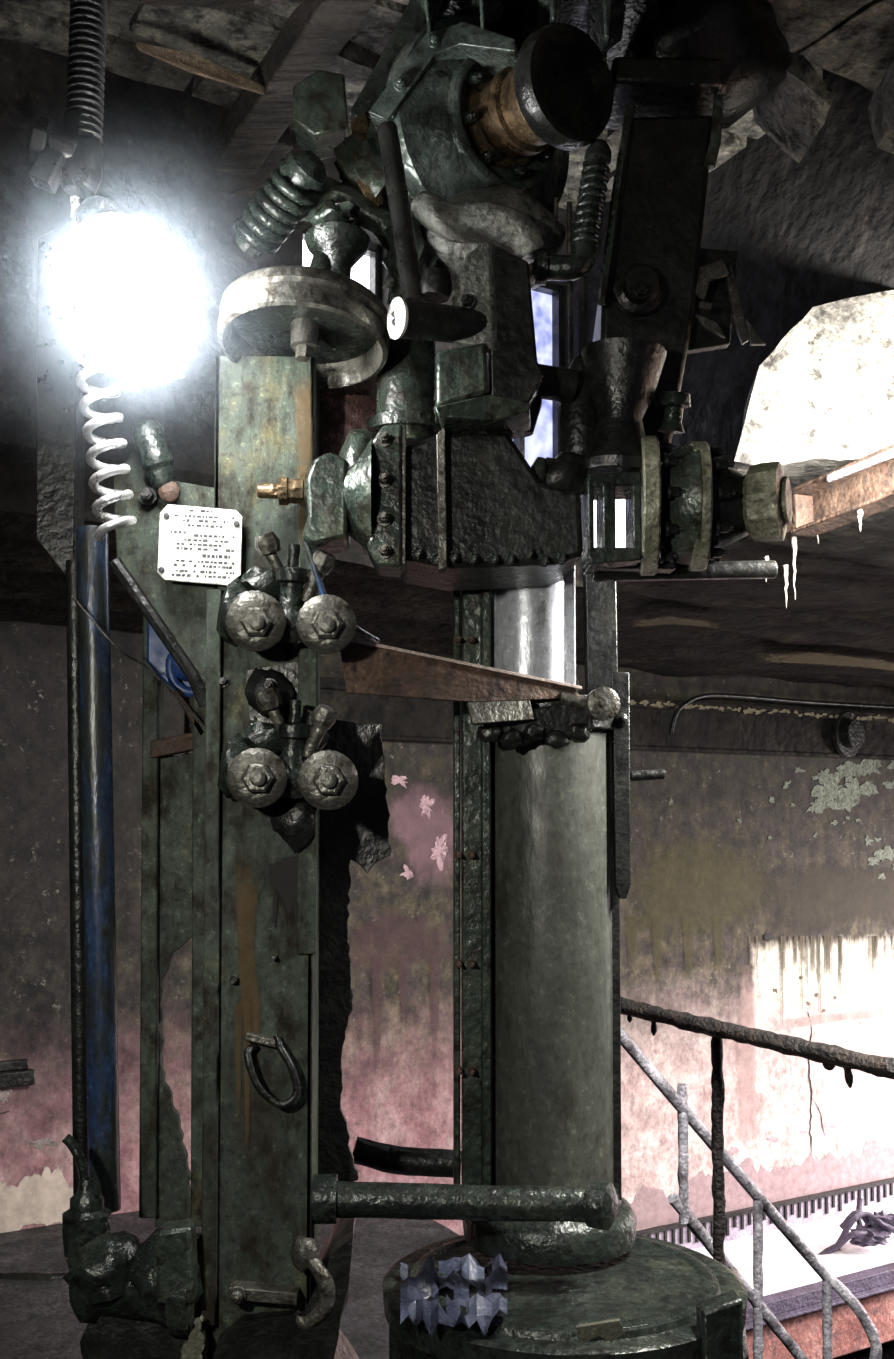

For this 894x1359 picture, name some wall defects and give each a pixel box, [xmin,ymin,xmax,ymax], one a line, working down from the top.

peeling [768,759,894,880]
water stain [773,868,894,1026]
spalling [0,1088,12,1107]
spalling [0,1166,73,1233]